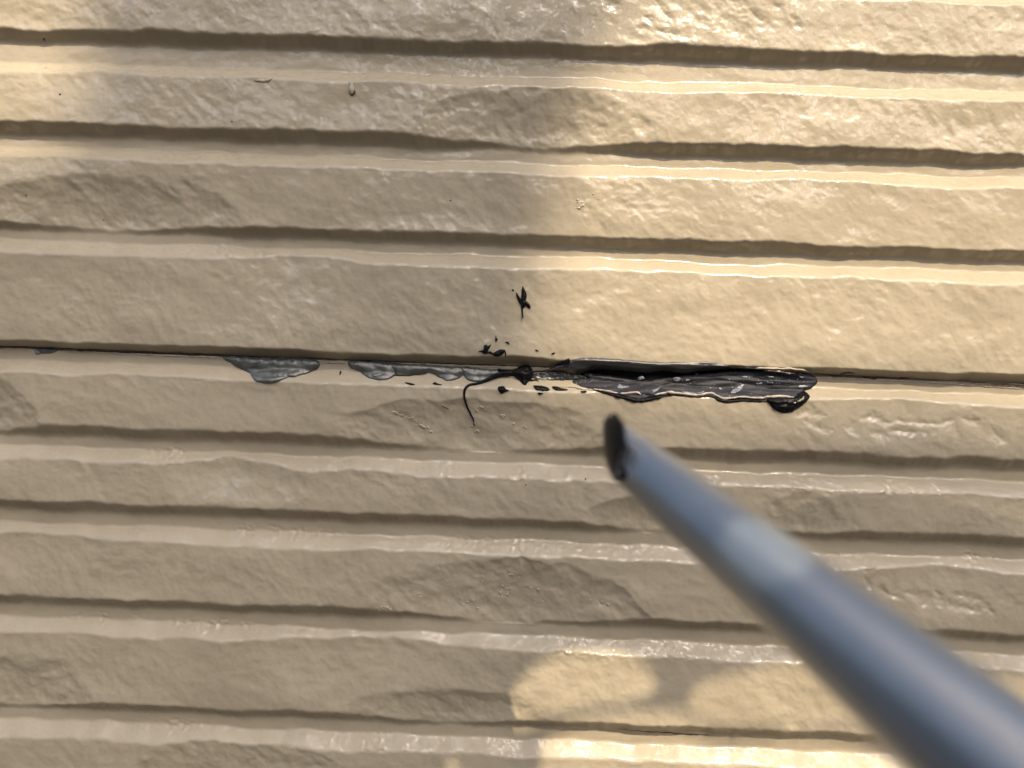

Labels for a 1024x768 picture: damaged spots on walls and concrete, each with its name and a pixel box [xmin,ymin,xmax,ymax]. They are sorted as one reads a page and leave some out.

crack [815,372,1024,389]